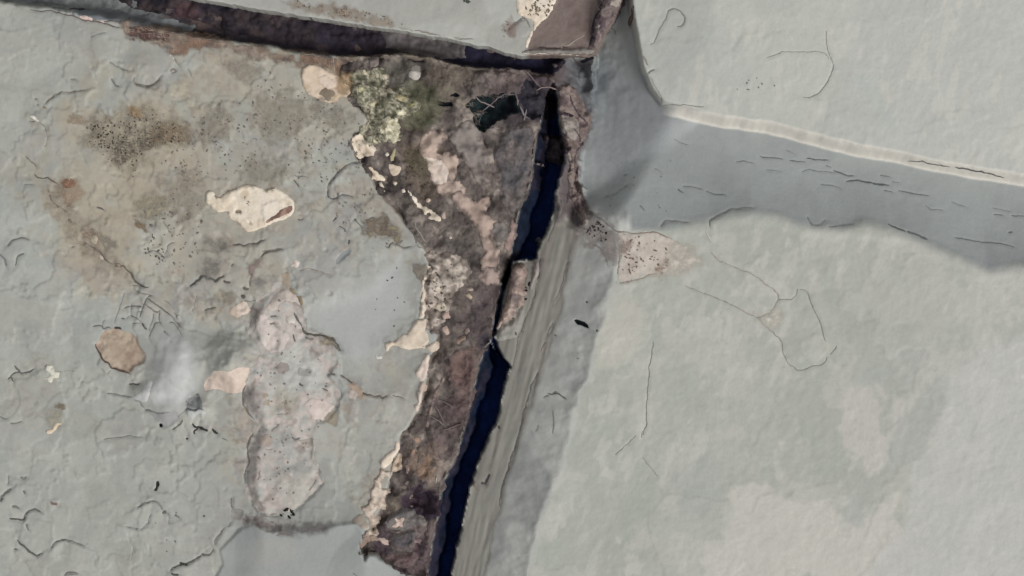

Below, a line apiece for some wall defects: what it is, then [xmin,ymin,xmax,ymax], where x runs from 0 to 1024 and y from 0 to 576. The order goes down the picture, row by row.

flaking render [502,0,634,69]
water stain [68,59,346,267]
crack [740,150,1004,210]
crack [0,237,29,267]
crack [26,157,182,347]
peeling [617,230,702,284]
spalling [93,322,146,377]
flaking render [149,185,341,576]
crack [342,376,404,401]
spalling [301,54,592,576]
crack [472,169,837,504]
crack [192,424,226,440]